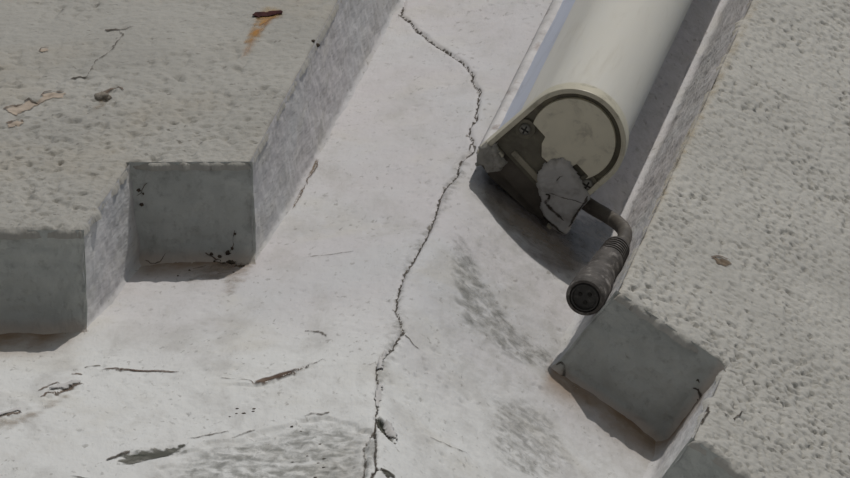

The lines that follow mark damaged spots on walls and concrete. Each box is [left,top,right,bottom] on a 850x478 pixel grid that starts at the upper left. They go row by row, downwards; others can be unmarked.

corrosion [249,9,283,41]
crack [70,28,127,79]
peeling [3,90,66,128]
crack [362,7,482,478]
crack [105,365,179,373]
spalling [106,444,185,464]